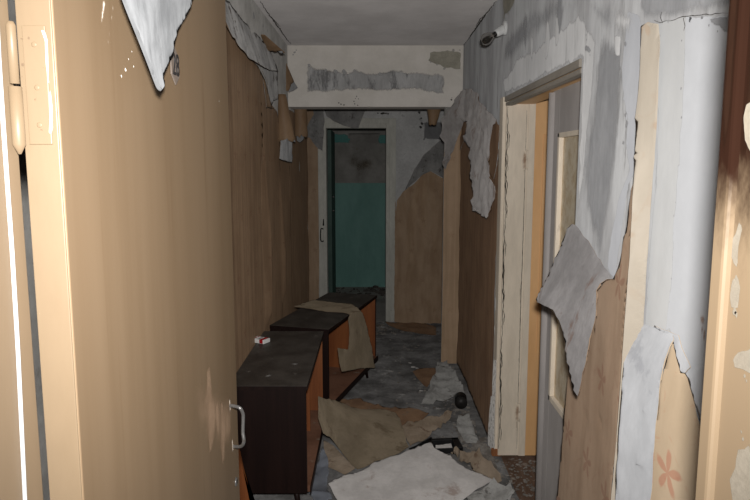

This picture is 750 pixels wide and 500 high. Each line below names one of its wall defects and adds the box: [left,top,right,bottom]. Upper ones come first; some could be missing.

peeling [307,49,461,106]
peeling [423,122,442,140]
peeling [587,0,738,277]
peeling [730,223,742,318]
peeling [733,349,750,382]
peeling [488,360,496,449]
peeling [730,430,750,500]